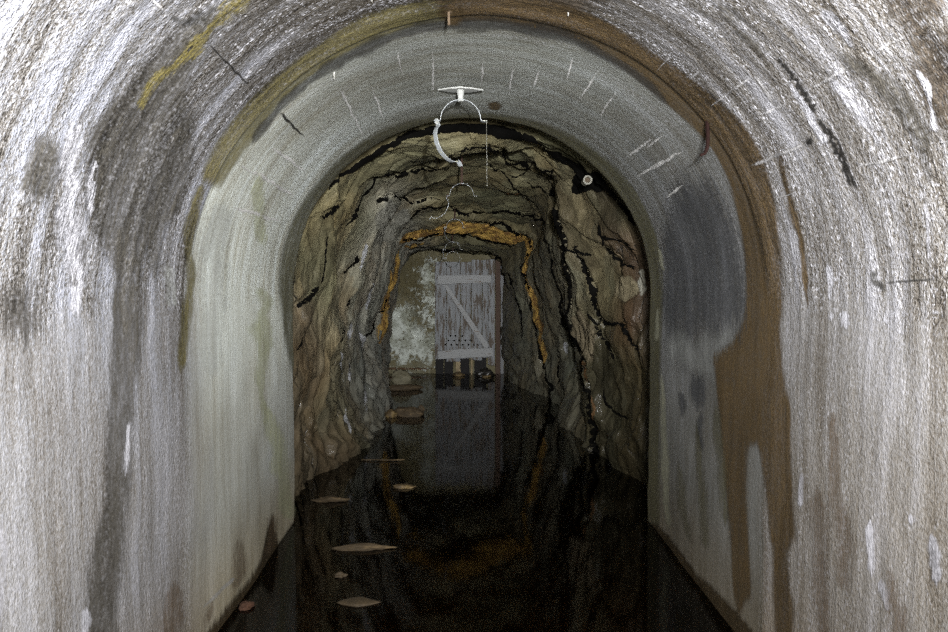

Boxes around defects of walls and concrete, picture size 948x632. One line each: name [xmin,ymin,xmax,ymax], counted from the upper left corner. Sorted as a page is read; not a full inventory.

water stain [5,285,41,348]
water stain [23,0,459,632]
rust [439,0,794,632]
rust [779,155,808,305]